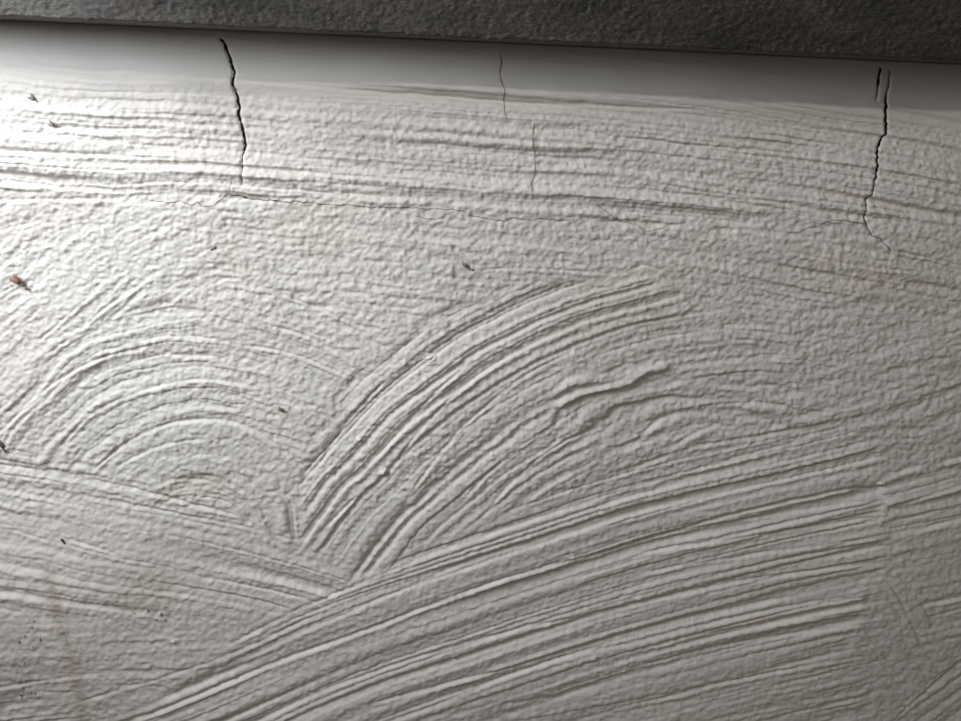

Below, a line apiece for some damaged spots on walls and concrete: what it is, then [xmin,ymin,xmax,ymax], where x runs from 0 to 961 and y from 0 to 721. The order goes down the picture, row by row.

crack [150,39,566,222]
crack [597,205,666,232]
crack [792,67,890,249]